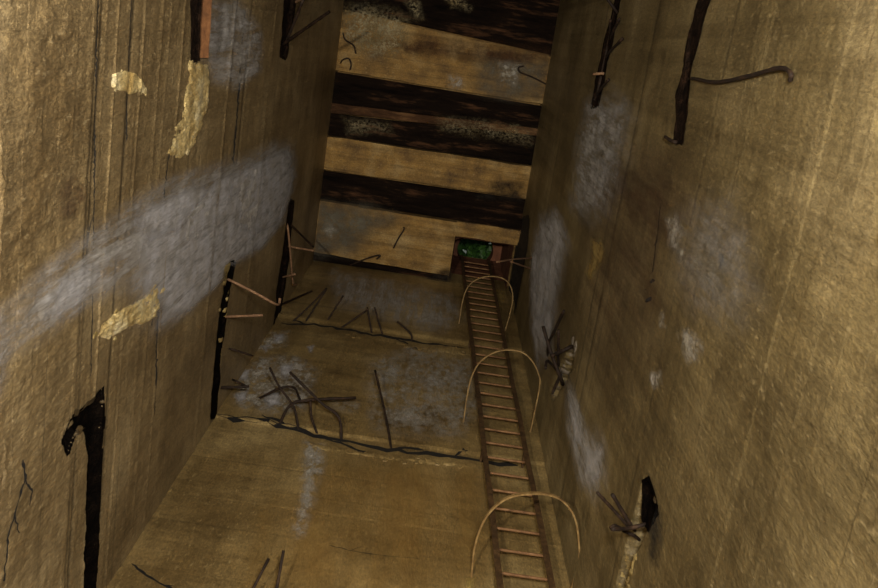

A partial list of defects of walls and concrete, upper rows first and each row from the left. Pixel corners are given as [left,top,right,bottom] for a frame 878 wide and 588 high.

spalling [111,69,147,96]
spalling [168,60,210,158]
damp [576,104,622,212]
peeling [93,284,165,341]
crack [282,320,463,349]
spalling [542,310,577,401]
crack [217,414,518,467]
spalling [596,476,659,541]